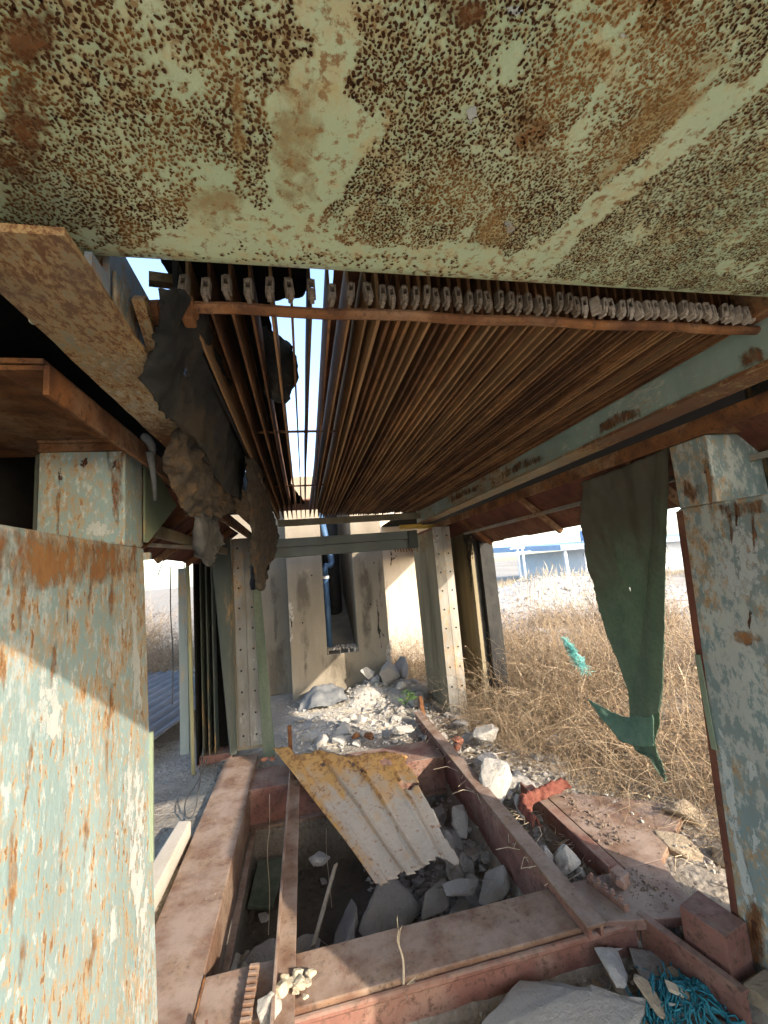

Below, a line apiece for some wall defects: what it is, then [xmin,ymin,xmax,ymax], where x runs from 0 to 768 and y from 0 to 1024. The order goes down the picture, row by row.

corrosion [450,2,485,27]
corrosion [0,13,53,181]
corrosion [600,410,636,433]
corrosion [107,453,123,518]
corrosion [683,461,761,547]
corrosion [0,531,137,628]
corrosion [734,612,758,646]
corrosion [747,904,764,967]